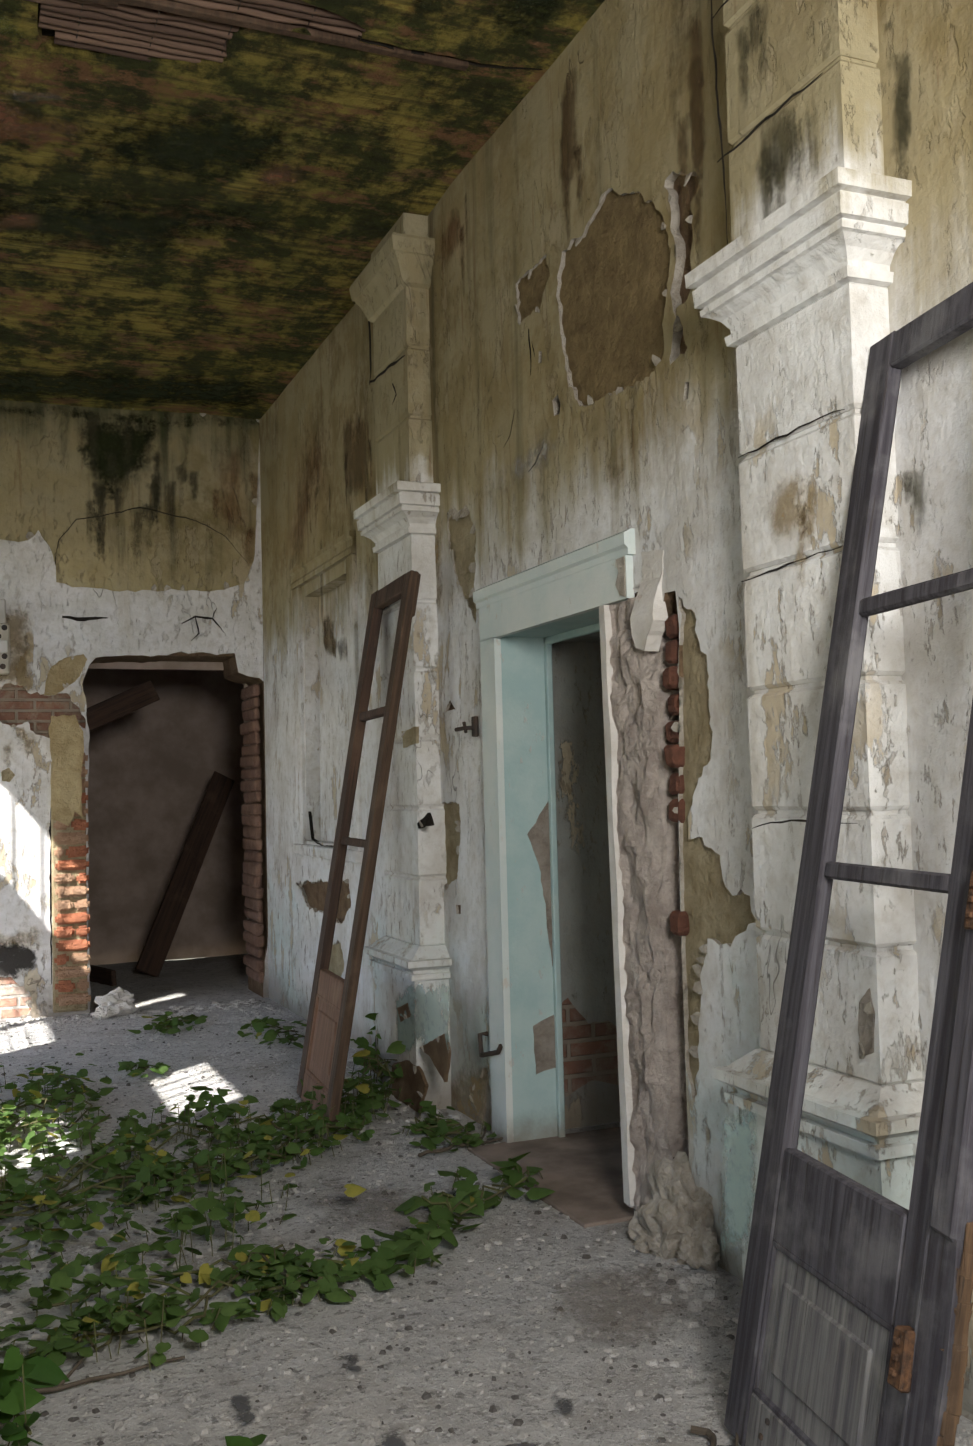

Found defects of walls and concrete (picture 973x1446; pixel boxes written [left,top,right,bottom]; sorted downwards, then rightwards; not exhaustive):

leakage [562,79,582,225]
leakage [677,19,704,238]
crack [711,0,823,245]
leakage [760,114,795,219]
leakage [895,58,910,160]
flaking render [515,171,699,416]
peeling [0,400,260,592]
leakage [79,422,196,552]
flaking render [0,654,87,738]
crack [182,608,223,641]
flaking render [615,550,756,1099]
flaking render [296,878,351,977]